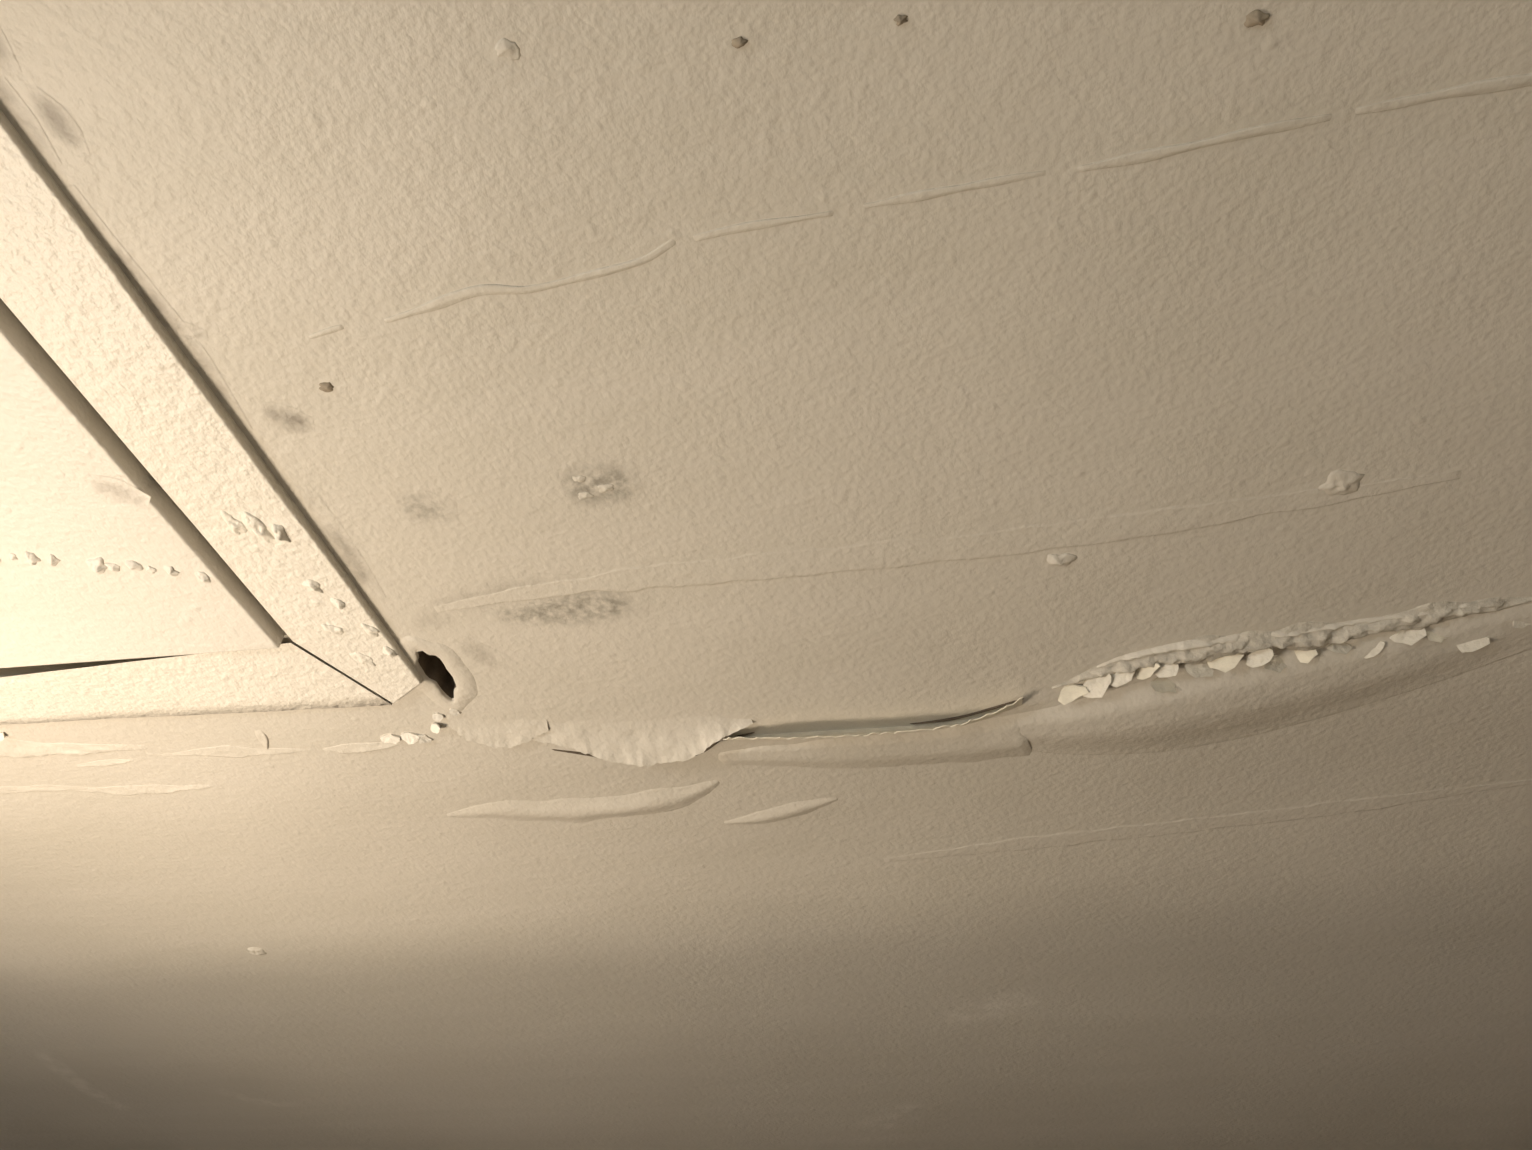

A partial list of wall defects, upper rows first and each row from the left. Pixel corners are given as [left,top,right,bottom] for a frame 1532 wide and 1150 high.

spalling [399,636,478,722]